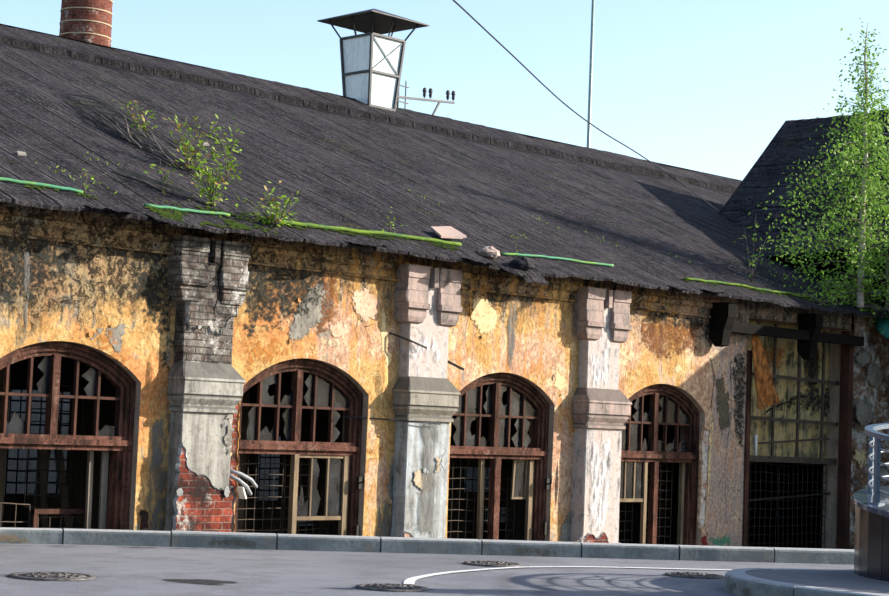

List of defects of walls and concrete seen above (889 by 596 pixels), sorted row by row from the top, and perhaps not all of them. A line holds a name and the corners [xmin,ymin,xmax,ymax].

leakage [0,236,93,339]
leakage [105,248,175,371]
leakage [244,265,327,336]
spalling [171,397,241,534]
spalling [137,509,159,531]
flaking render [560,510,619,543]